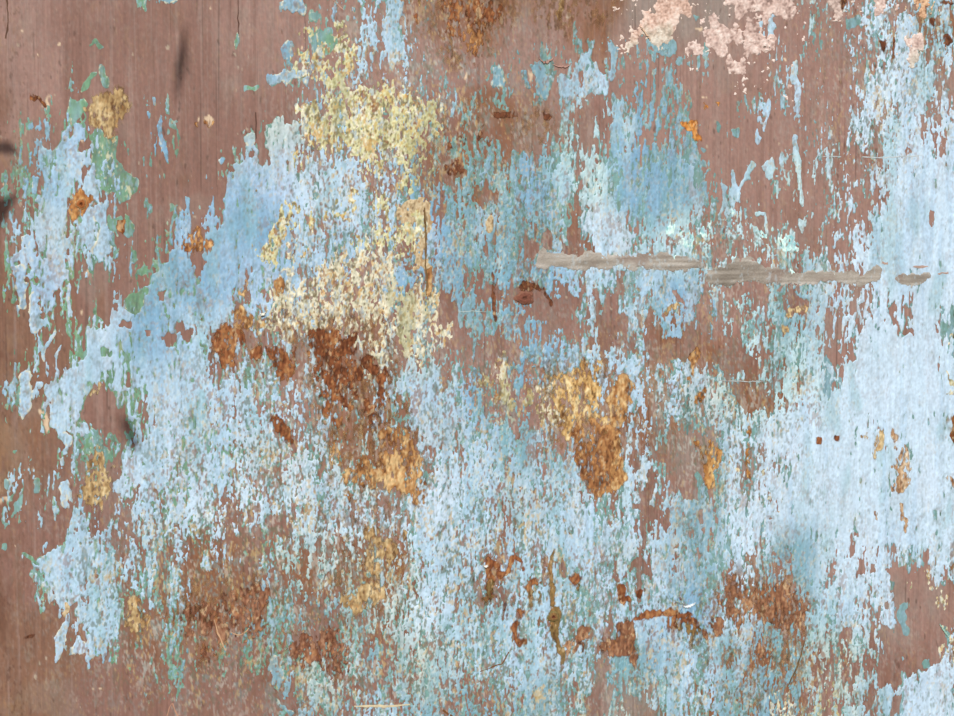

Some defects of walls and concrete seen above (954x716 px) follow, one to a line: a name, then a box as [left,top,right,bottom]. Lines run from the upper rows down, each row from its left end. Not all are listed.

rust [414,0,503,57]
peeling [68,64,110,93]
peeling [485,52,513,112]
peeling [142,93,180,177]
peeling [762,134,808,207]
rust [212,277,426,505]
rust [551,360,636,499]
peeling [1,462,43,529]
peeling [44,496,60,521]
rust [861,428,912,533]
rust [482,549,591,665]
rust [599,575,808,667]